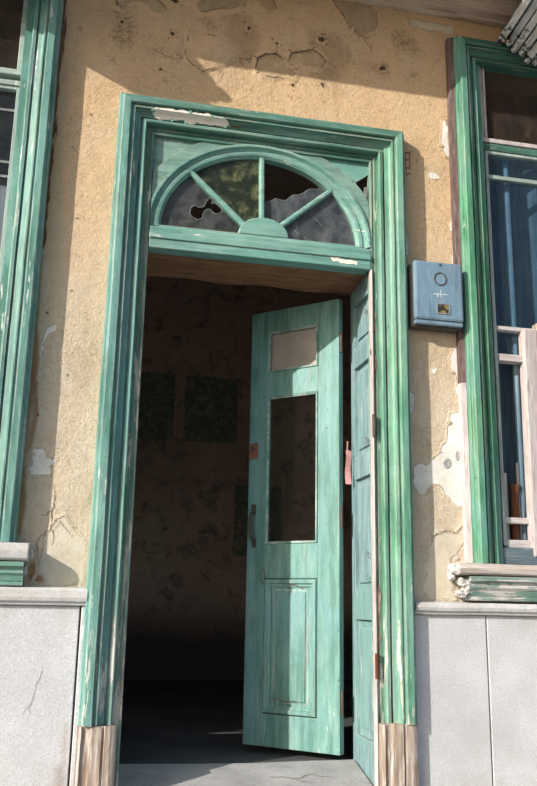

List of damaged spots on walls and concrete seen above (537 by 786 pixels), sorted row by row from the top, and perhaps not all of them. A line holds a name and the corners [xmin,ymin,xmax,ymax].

flaking render [250,33,330,91]
peeling [151,107,242,128]
flaking render [439,118,449,160]
flaking render [411,345,462,510]
flaking render [25,446,58,477]
crack [35,490,55,557]